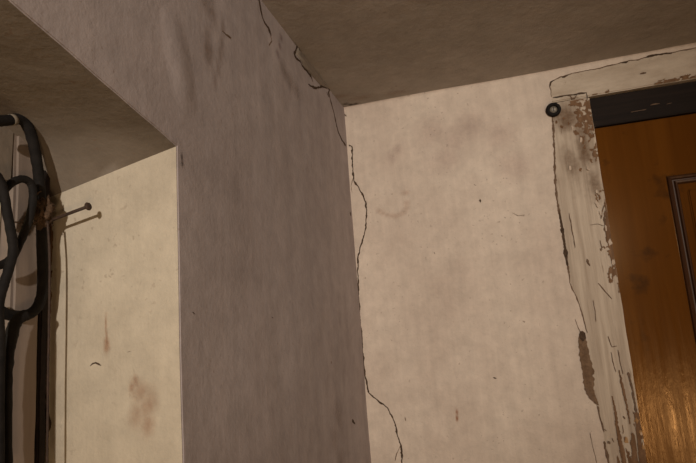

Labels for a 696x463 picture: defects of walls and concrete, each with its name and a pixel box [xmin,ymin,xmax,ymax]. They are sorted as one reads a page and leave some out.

crack [258,0,272,45]
peeling [555,90,610,172]
crack [294,43,403,463]
peeling [592,183,620,299]
flaking render [578,331,599,405]
peeling [607,336,647,463]